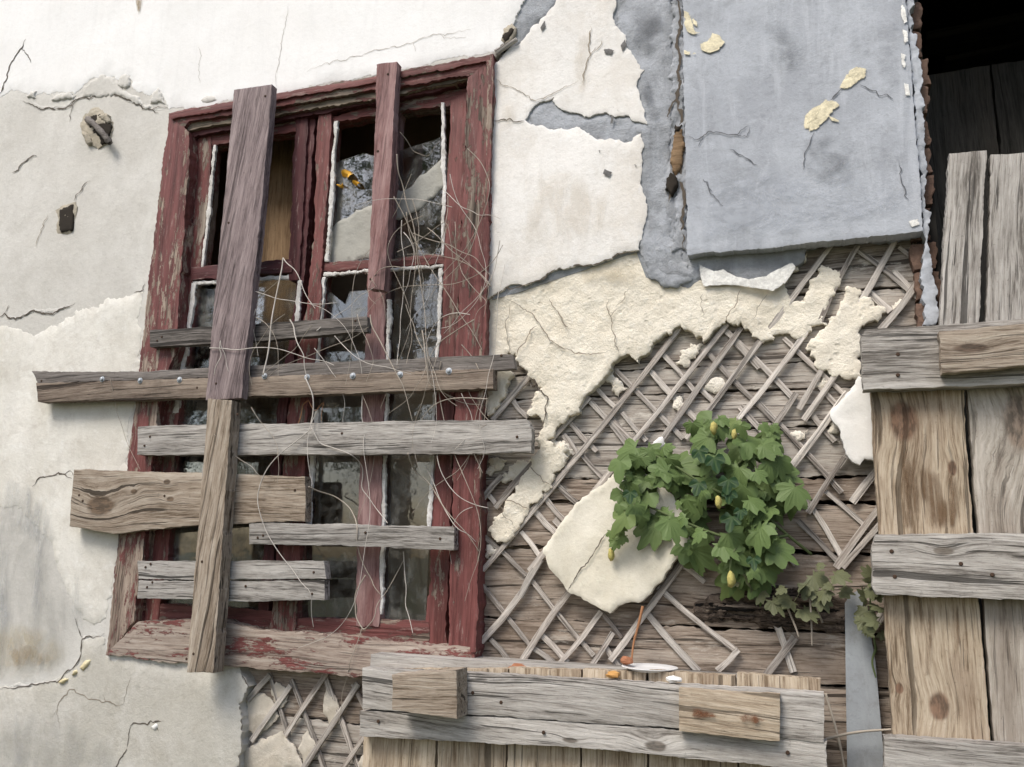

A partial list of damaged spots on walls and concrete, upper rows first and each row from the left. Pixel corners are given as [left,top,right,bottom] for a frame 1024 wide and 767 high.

peeling [500,0,556,54]
crack [0,40,169,119]
peeling [51,74,165,149]
peeling [528,0,795,291]
spalling [56,202,78,235]
crack [0,302,76,320]
crack [489,250,639,427]
crack [33,471,73,486]
crack [1,619,161,767]